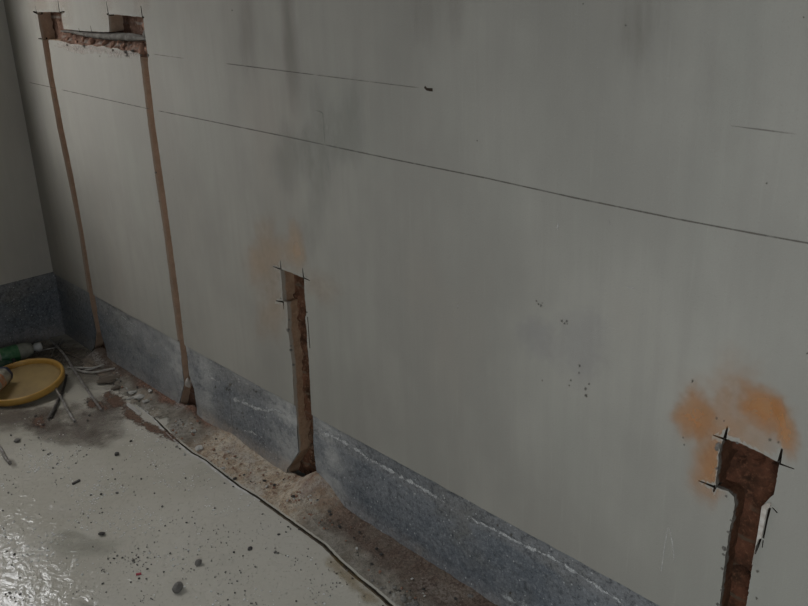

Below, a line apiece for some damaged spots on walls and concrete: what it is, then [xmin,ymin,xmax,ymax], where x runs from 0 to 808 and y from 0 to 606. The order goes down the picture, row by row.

flaking render [50,12,148,58]
flaking render [293,274,313,430]
flaking render [188,385,197,408]
flaking render [299,440,316,475]
flaking render [726,441,779,606]